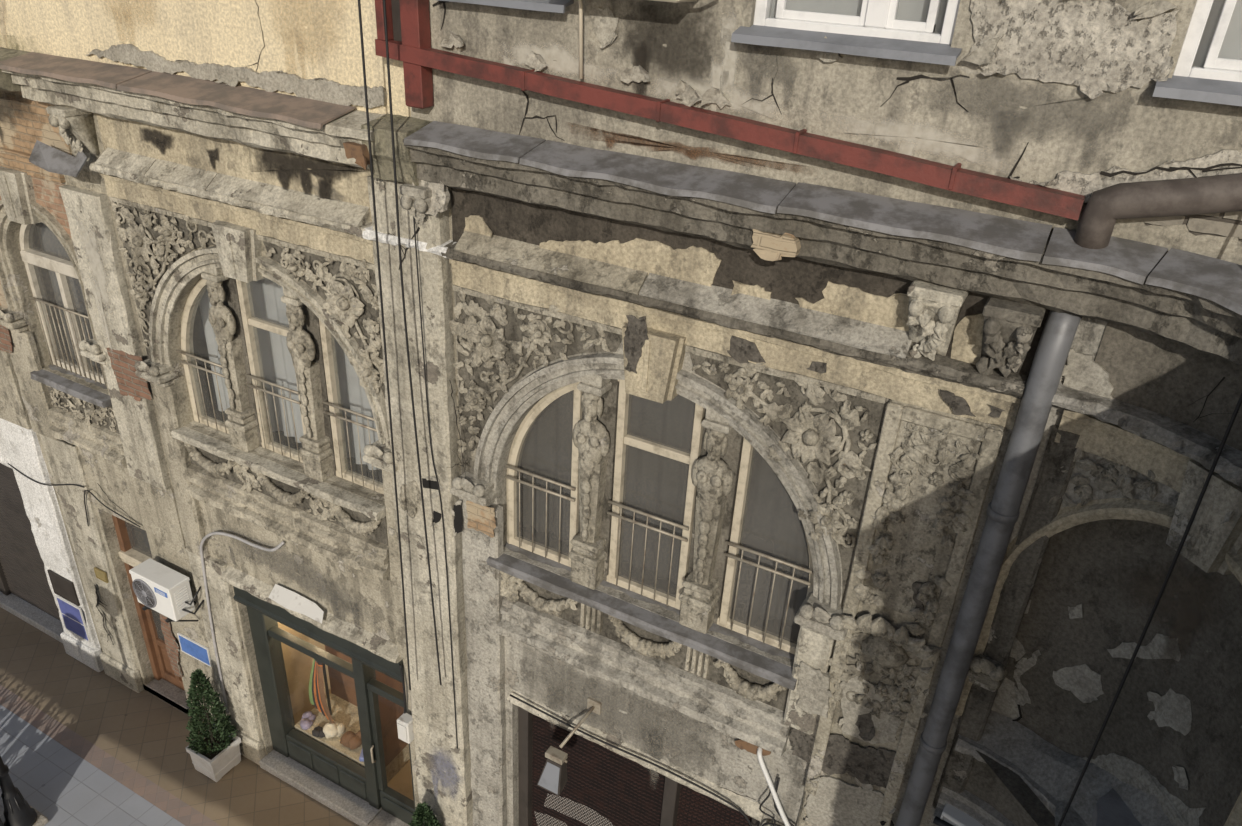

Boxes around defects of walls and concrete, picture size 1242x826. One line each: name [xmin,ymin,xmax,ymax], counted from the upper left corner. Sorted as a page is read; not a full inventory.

flaking render [961,0,1180,100]
water stain [0,92,24,139]
crack [519,90,565,141]
crack [743,57,782,115]
crack [880,74,970,112]
water stain [257,149,358,200]
flaking render [539,238,721,287]
flaking render [751,229,801,261]
flaking render [731,280,771,300]
flaking render [795,281,909,332]
flaking render [1062,348,1114,399]
flaking render [1053,664,1104,703]